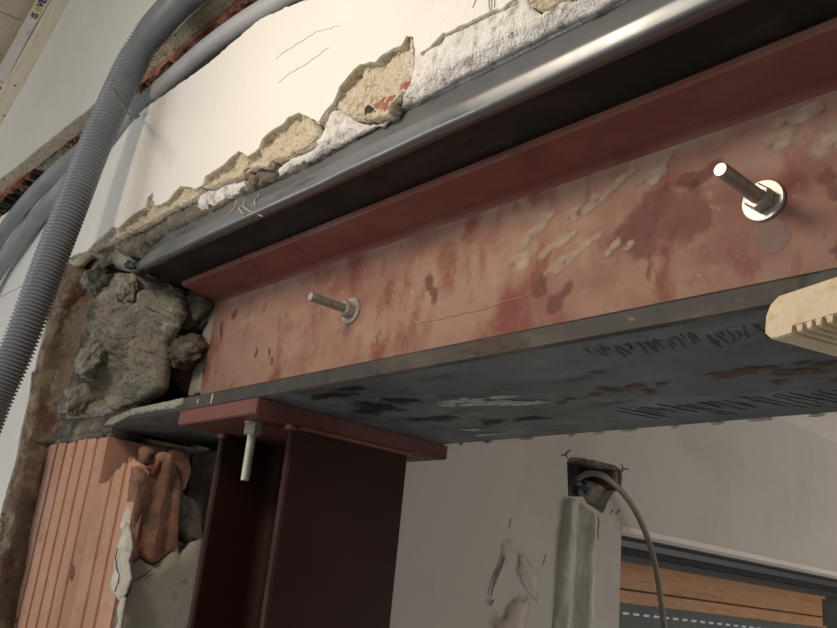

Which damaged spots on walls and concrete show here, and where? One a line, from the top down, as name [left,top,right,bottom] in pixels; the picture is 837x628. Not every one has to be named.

spalling [529,0,577,15]
crack [276,26,339,83]
spalling [337,38,415,125]
spalling [0,114,325,628]